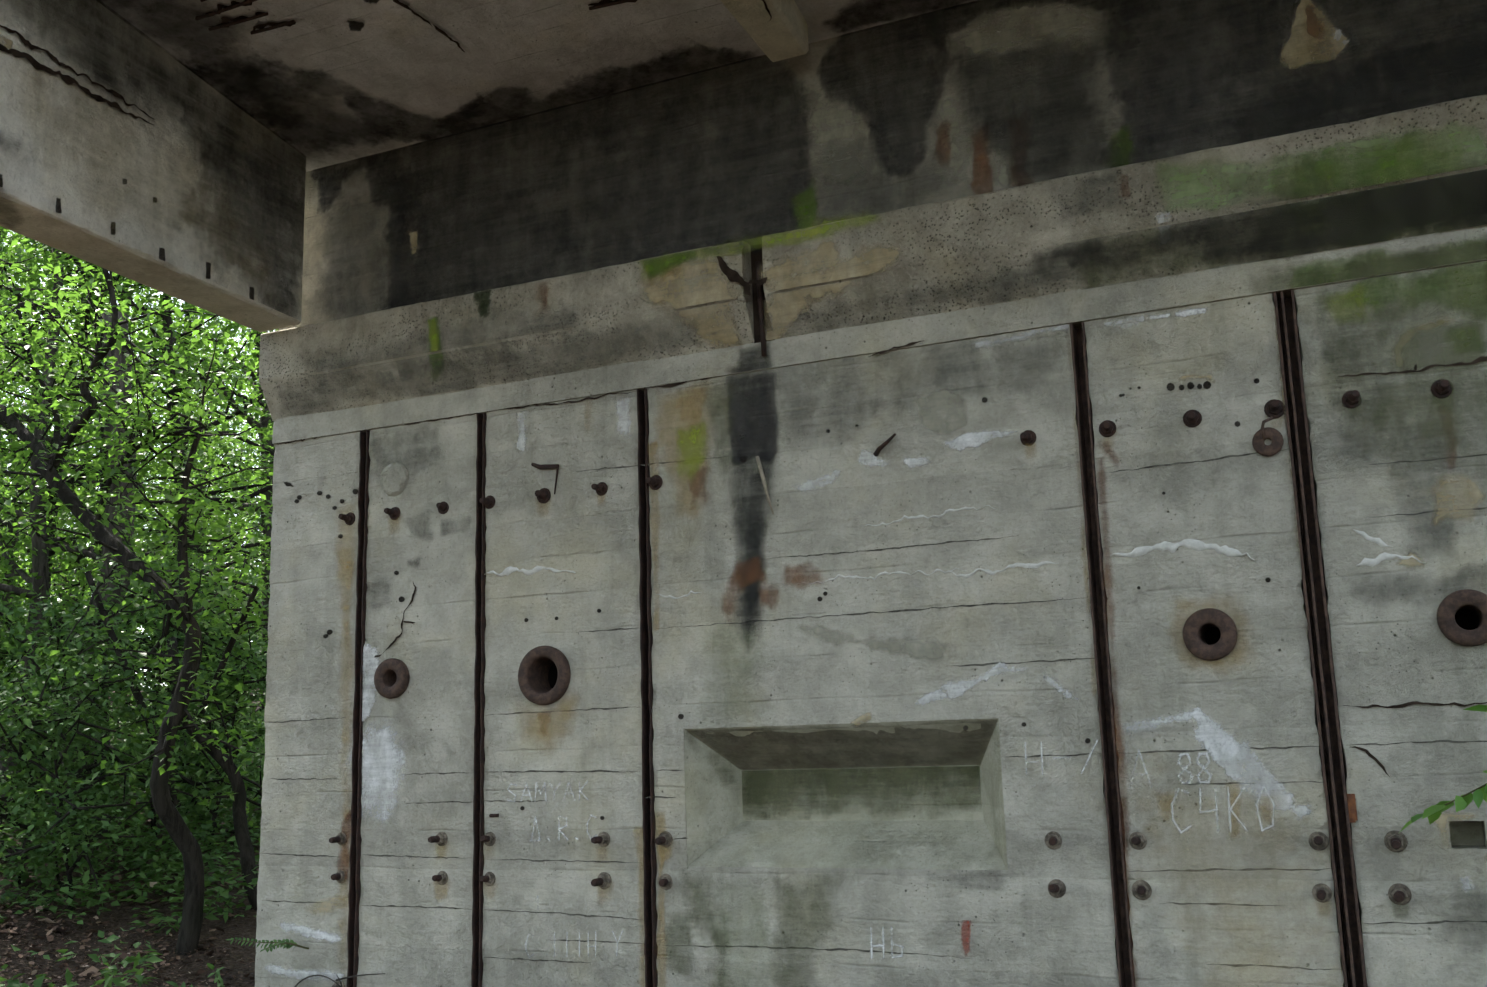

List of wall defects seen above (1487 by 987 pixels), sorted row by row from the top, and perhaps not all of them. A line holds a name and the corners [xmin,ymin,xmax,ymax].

crack [0,25,155,125]
leakage [819,0,1487,183]
spalling [1282,0,1349,68]
leakage [24,0,811,316]
leakage [1039,169,1487,282]
leakage [711,348,777,642]
crack [375,583,416,657]
leakage [1151,707,1310,817]